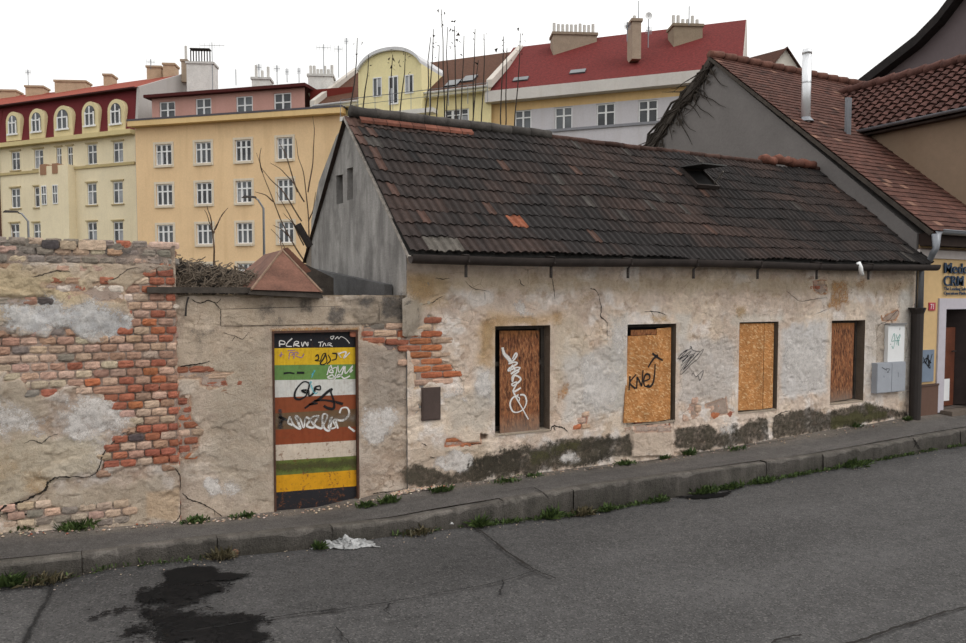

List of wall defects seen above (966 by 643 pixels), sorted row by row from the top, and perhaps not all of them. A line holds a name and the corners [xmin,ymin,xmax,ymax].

spalling [0,236,242,478]
spalling [350,316,462,390]
water stain [675,403,907,451]
crack [0,425,137,517]
crack [174,468,221,522]
water stain [400,433,632,487]
crack [3,582,54,643]
water stain [87,579,274,643]
crack [100,527,555,643]